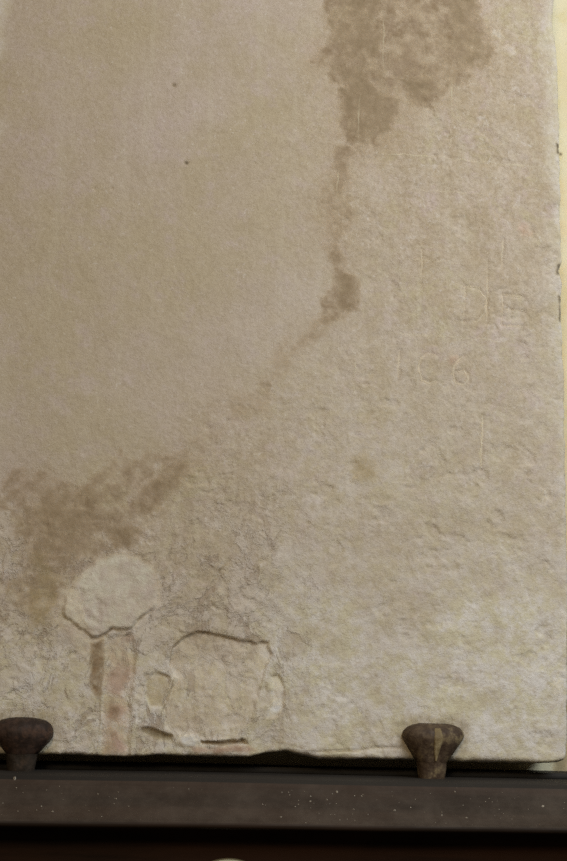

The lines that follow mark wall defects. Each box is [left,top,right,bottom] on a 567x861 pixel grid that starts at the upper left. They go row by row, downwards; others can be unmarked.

damp [322,0,494,192]
damp [321,252,359,322]